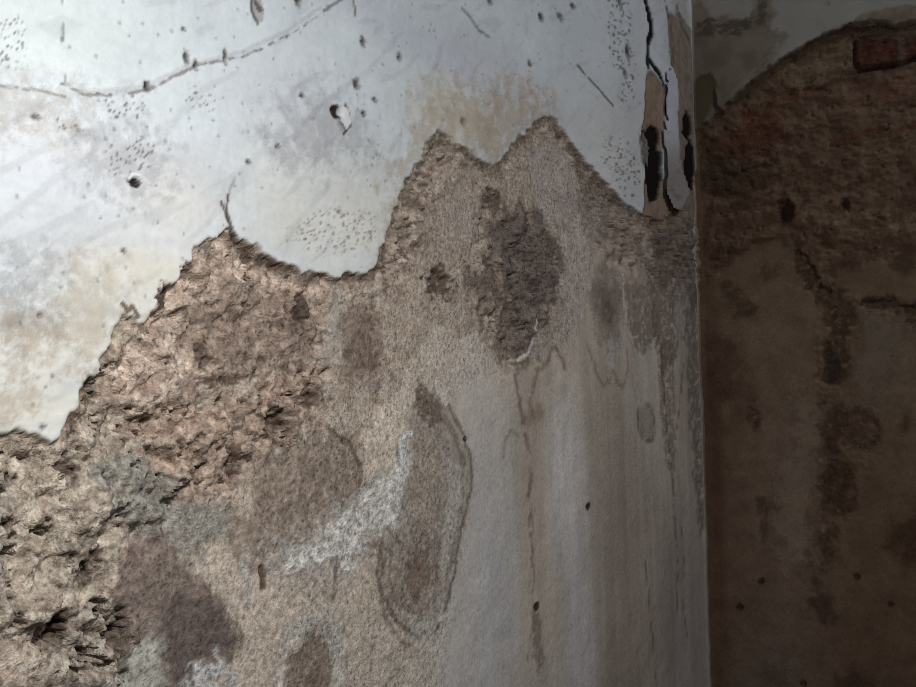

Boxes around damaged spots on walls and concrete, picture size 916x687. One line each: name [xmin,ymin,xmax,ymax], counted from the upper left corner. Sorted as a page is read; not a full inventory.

crack [129,42,272,94]
crack [644,0,667,114]
flaking render [695,5,916,385]
flaking render [0,0,698,687]
leakage [515,314,565,393]
leakage [107,531,244,687]
leakage [227,373,472,687]
leakage [759,393,882,573]